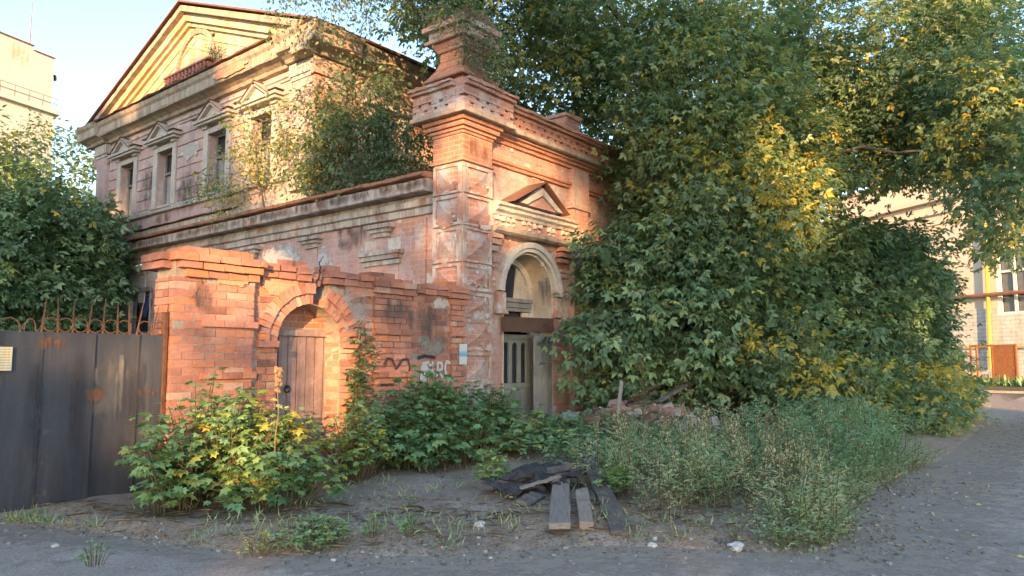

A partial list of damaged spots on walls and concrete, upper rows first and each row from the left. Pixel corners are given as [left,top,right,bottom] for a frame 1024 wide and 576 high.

spalling [262,248,300,296]